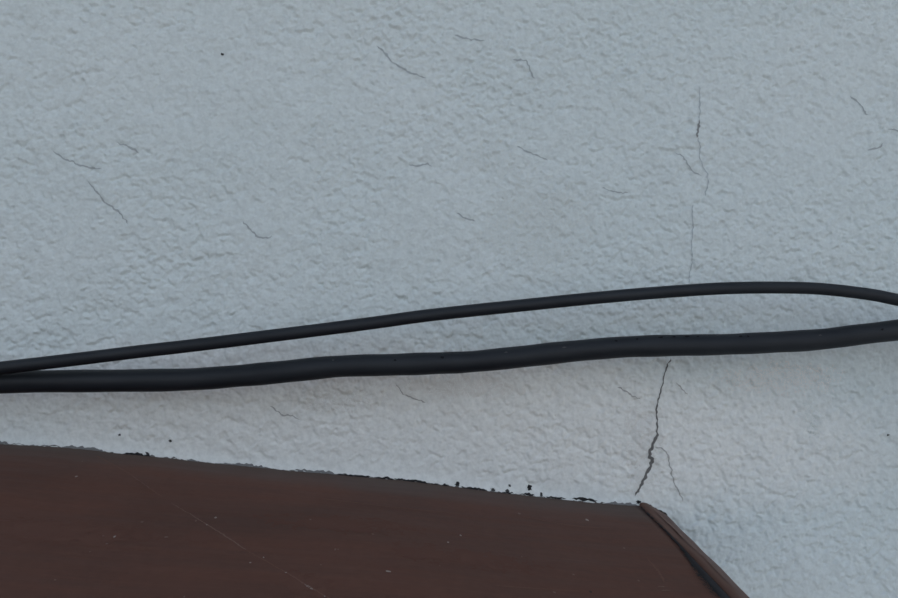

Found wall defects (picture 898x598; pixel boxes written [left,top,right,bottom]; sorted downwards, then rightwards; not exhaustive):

crack [618,359,687,501]